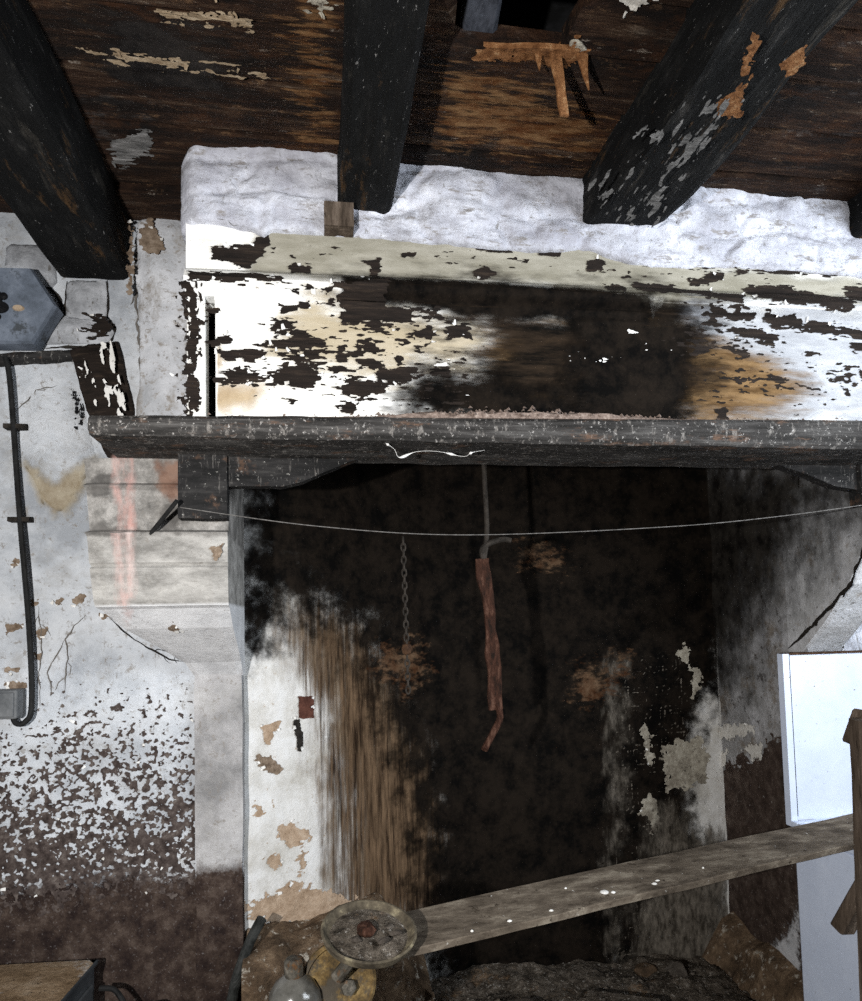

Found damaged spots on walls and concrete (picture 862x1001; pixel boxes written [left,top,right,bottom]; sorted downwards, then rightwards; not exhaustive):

peeling [75,47,270,84]
peeling [154,0,255,34]
peeling [471,248,561,281]
peeling [578,254,862,420]
water stain [25,464,112,513]
crack [788,549,862,648]
peeling [0,681,195,920]
spalling [254,720,284,775]
flaking render [298,696,315,719]
peeling [637,722,791,841]
spalling [244,819,359,924]
peeling [728,863,802,971]